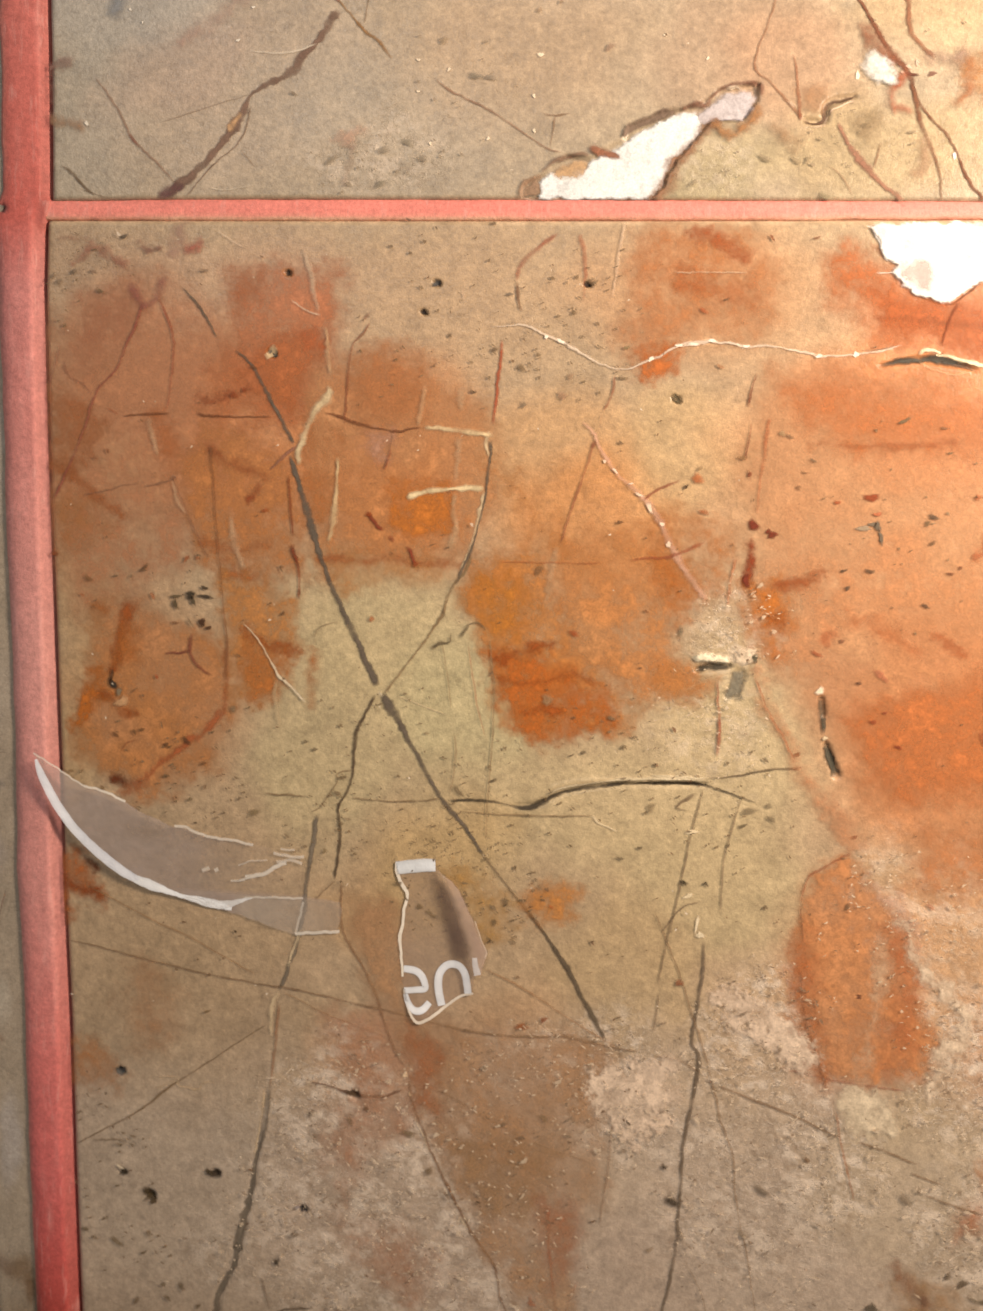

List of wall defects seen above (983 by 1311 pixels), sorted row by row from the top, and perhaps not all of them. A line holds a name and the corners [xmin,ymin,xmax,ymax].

crack [108,0,387,198]
spalling [511,80,764,199]
crack [754,6,902,201]
spalling [856,52,896,84]
crack [858,0,983,200]
spalling [872,220,983,305]
corrosion [211,270,494,593]
corrosion [70,572,296,800]
corrosion [460,555,624,739]
crack [56,270,983,1311]
corrosion [795,856,939,1086]
peeling [177,955,896,1311]